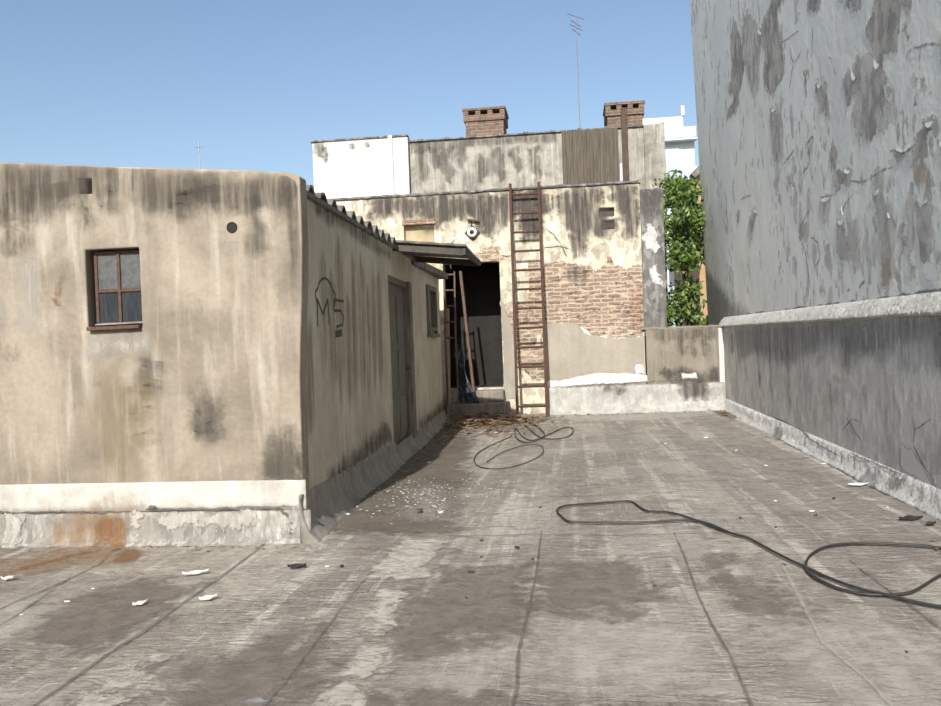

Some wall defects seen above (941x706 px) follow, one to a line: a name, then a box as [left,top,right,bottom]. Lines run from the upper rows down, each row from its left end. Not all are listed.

peeling [726,0,785,162]
peeling [838,0,911,143]
leakage [3,167,87,213]
leakage [132,171,291,250]
leakage [416,135,548,181]
leakage [367,184,656,258]
peeling [819,140,939,292]
peeling [913,114,941,182]
flaking render [506,223,664,381]
crack [775,417,930,476]
corrosion [0,515,140,577]
leakage [383,560,664,661]